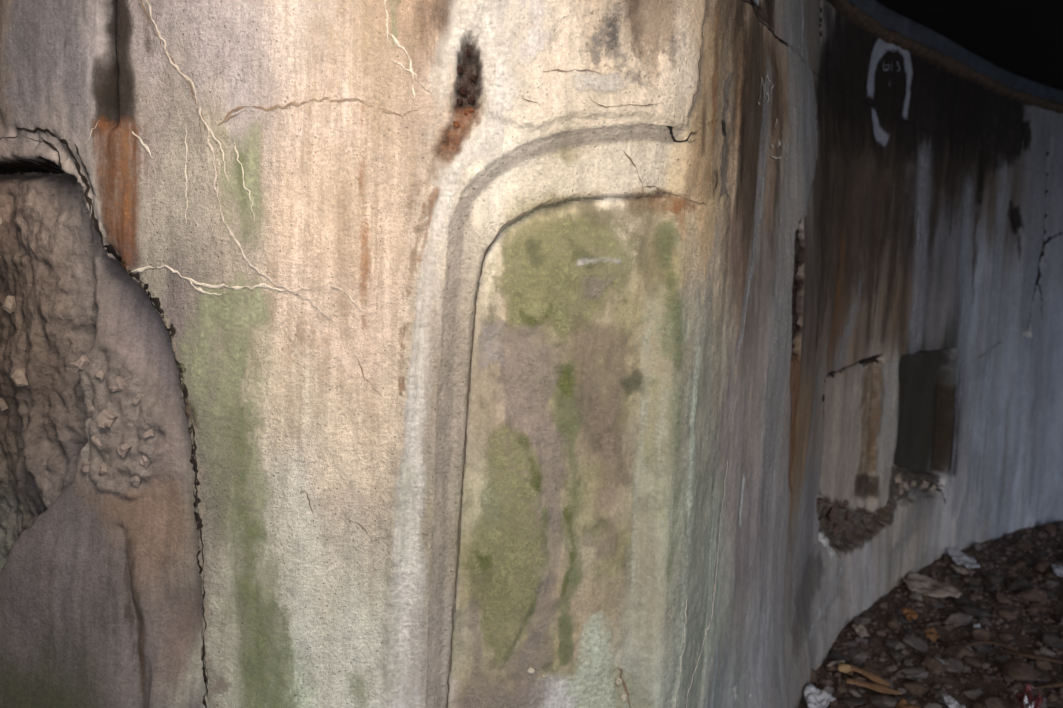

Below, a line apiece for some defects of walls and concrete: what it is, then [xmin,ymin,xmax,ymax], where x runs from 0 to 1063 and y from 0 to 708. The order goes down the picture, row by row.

water stain [94,0,134,127]
crack [590,20,718,143]
spalling [0,167,161,572]
rust [93,118,137,262]
spalling [185,399,206,519]
crack [0,0,433,708]
crack [446,198,554,708]
rust [789,217,805,483]
water stain [693,0,1007,518]
rust [855,364,885,497]
spalling [816,361,940,558]
water stain [533,615,613,708]